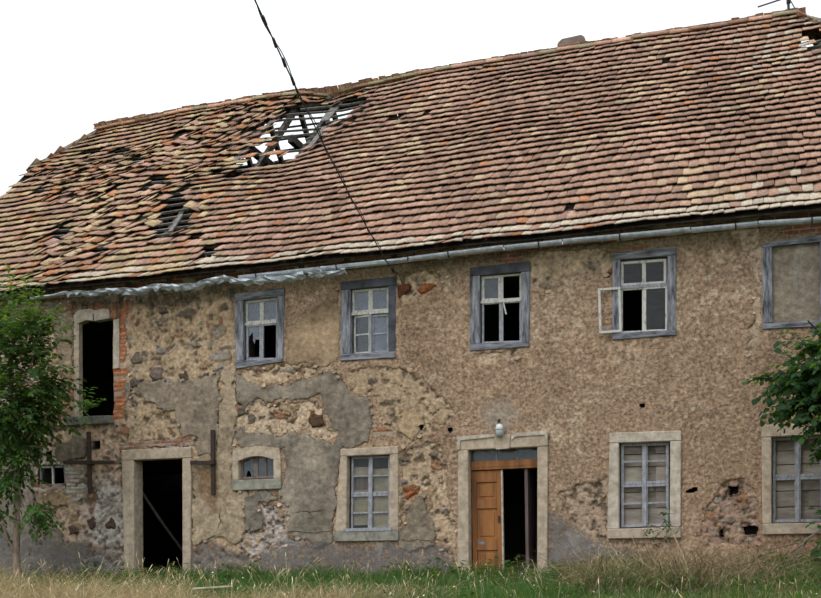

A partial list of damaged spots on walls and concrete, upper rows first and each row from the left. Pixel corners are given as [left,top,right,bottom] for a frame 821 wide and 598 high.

spalling [396,269,449,304]
spalling [0,286,337,580]
spalling [336,367,458,555]
spalling [695,479,762,546]